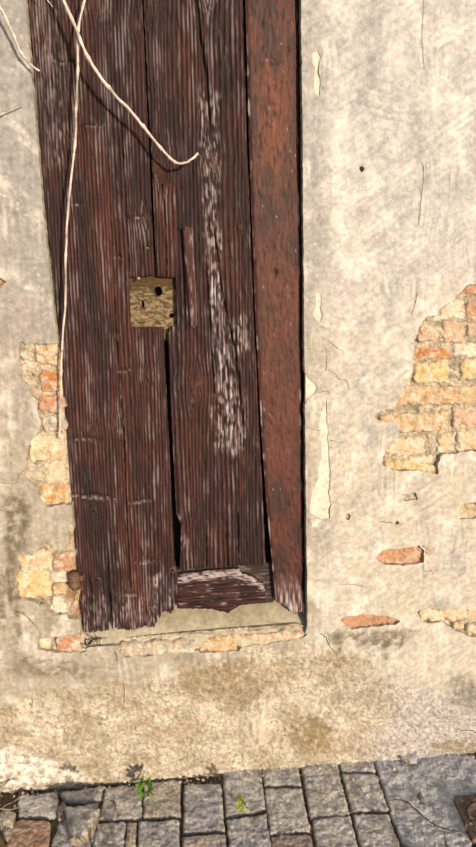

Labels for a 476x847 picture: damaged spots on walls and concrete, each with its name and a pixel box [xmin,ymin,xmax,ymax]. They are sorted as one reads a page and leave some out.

peeling [313,293,322,321]
peeling [304,373,317,403]
spalling [374,284,476,473]
spalling [20,341,72,505]
peeling [309,402,335,527]
spalling [459,502,476,518]
spalling [376,544,436,564]
spalling [16,531,80,616]
spalling [341,614,399,628]
spalling [417,608,476,636]
spalling [39,633,83,652]